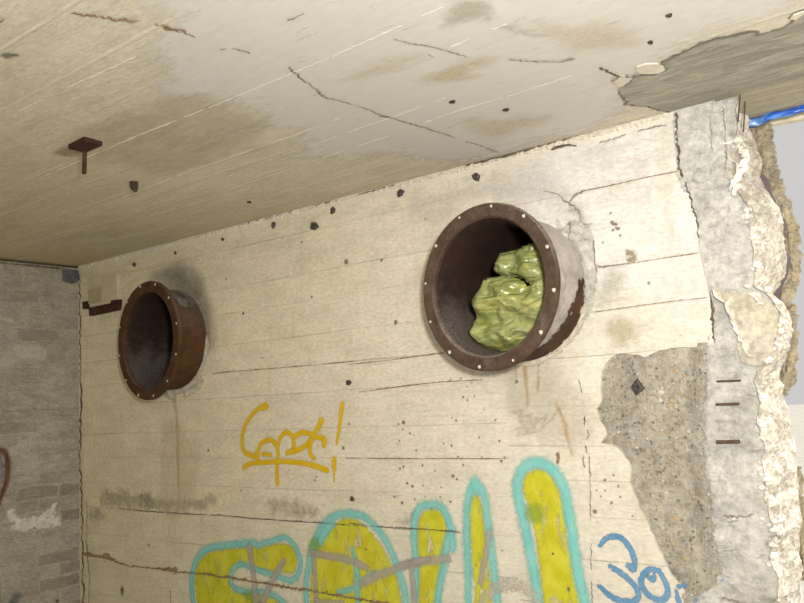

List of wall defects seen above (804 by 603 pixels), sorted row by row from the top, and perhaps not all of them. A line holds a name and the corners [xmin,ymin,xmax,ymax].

crack [71,12,194,37]
crack [289,67,579,166]
crack [543,112,700,271]
crack [0,262,389,603]
crack [328,353,441,365]
crack [346,455,495,463]
crack [362,379,483,392]
corrosion [522,278,586,376]
spalling [598,9,804,603]
crack [110,507,458,533]